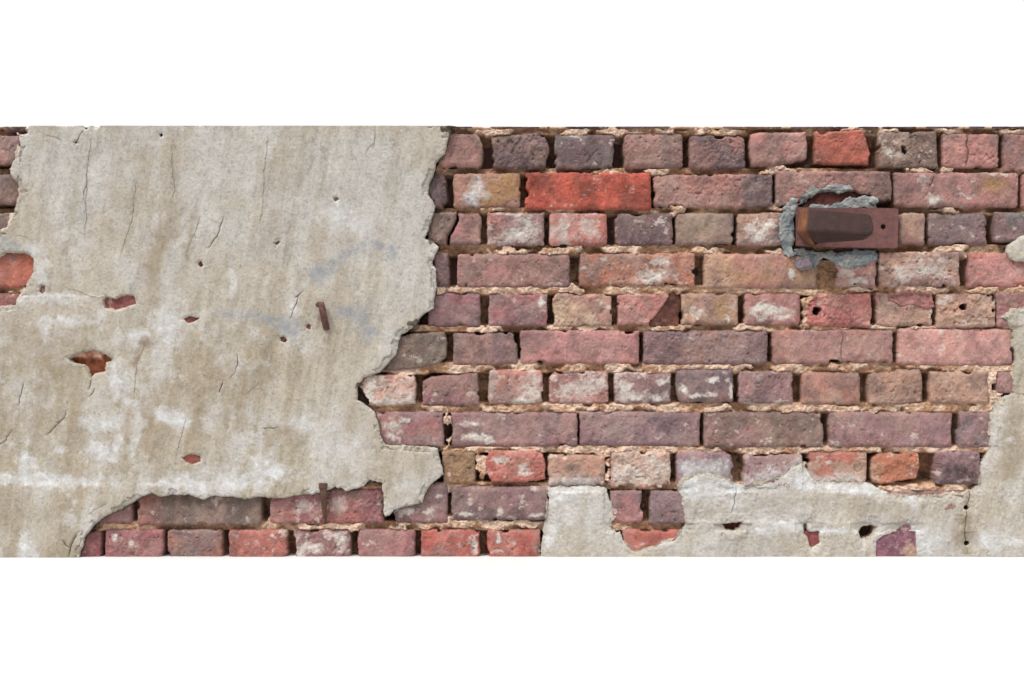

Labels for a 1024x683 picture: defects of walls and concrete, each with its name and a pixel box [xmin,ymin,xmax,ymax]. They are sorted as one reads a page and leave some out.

peeling [0,127,28,231]
spalling [790,192,879,207]
peeling [0,252,45,306]
spalling [103,295,136,311]
rust [312,307,334,348]
peeling [356,126,457,502]
spalling [649,292,680,327]
spalling [888,290,934,309]
spalling [69,350,112,378]
peeling [539,307,1024,557]
peeling [80,493,189,557]